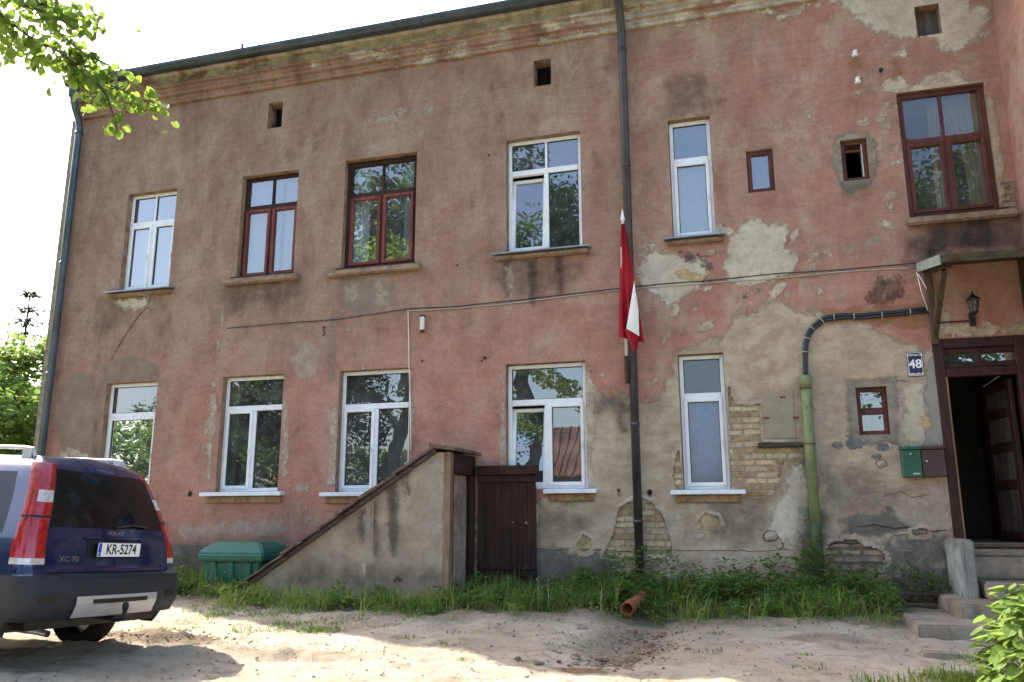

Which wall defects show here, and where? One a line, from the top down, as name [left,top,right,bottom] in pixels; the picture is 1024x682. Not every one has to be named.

flaking render [752,0,990,58]
flaking render [117,295,149,311]
damp [865,274,906,305]
peeling [536,217,952,600]
damp [389,484,409,550]
crack [828,524,945,546]